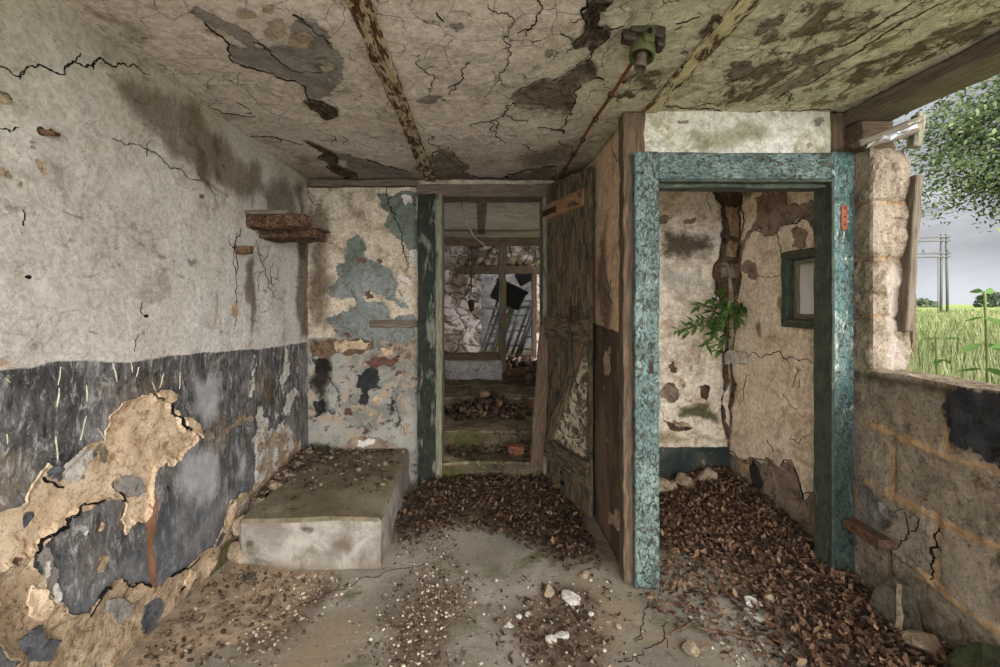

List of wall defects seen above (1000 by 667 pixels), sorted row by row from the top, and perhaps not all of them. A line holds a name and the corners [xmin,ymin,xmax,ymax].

crack [0,53,150,79]
peeling [188,5,344,121]
crack [470,0,573,152]
spalling [512,0,613,115]
crack [113,138,218,195]
water stain [297,243,328,335]
water stain [310,358,331,412]
peeling [310,234,417,417]
flaking render [712,192,814,536]
corrosion [146,491,158,588]
flaking render [0,346,324,667]
crack [890,508,941,580]